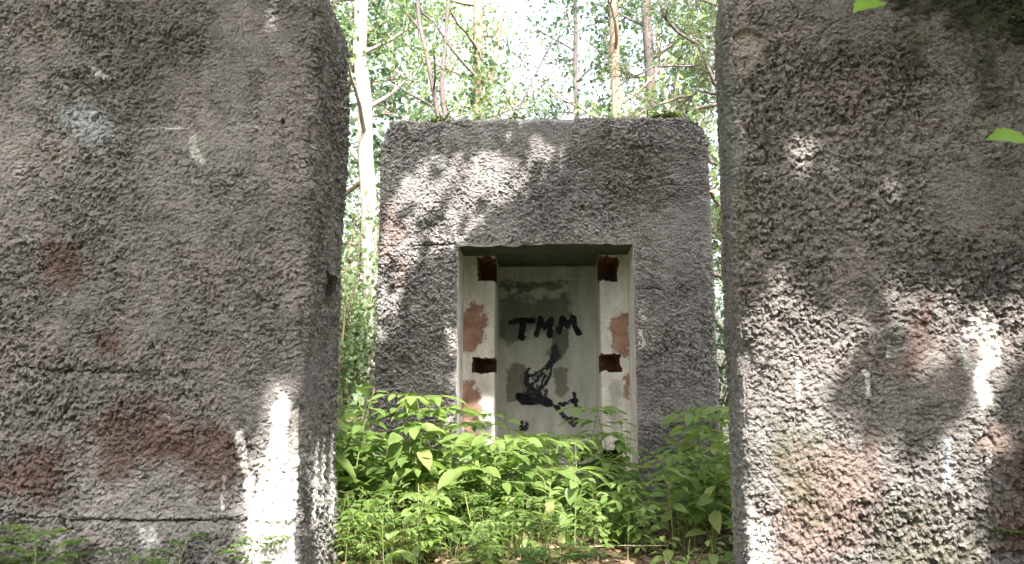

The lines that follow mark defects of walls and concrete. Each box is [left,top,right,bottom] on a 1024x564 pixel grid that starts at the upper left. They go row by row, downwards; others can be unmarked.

peeling [463,302,488,352]
peeling [609,313,629,358]
peeling [462,380,483,443]